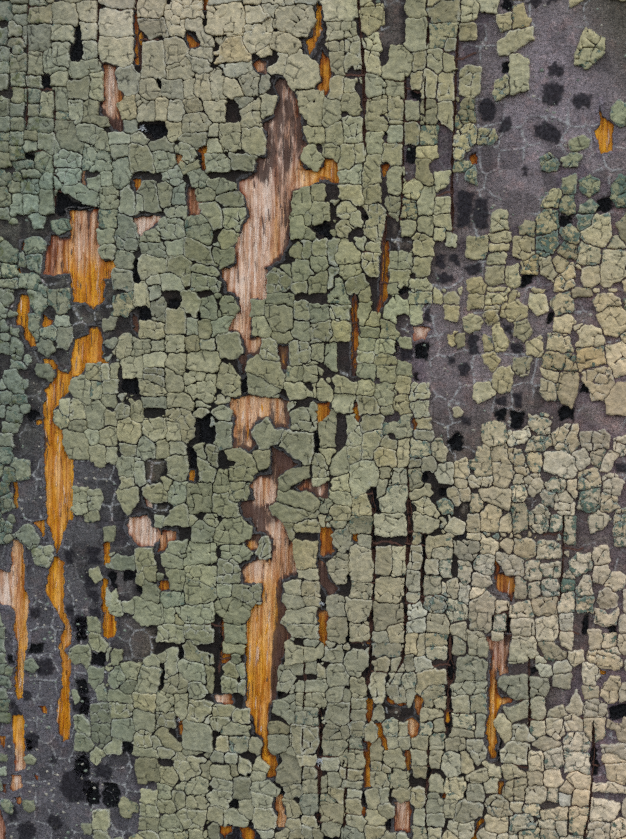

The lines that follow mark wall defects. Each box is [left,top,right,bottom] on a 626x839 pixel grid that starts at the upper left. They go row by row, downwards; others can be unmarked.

crack [91,0,159,72]
peeling [403,17,429,53]
crack [337,0,476,376]
peeling [437,0,626,401]
peeling [413,241,580,488]
peeling [572,429,626,552]
crack [540,515,584,636]
crack [284,467,461,839]
peeling [468,590,513,758]
crack [512,655,546,769]
crack [569,716,607,839]
peeling [592,716,626,794]